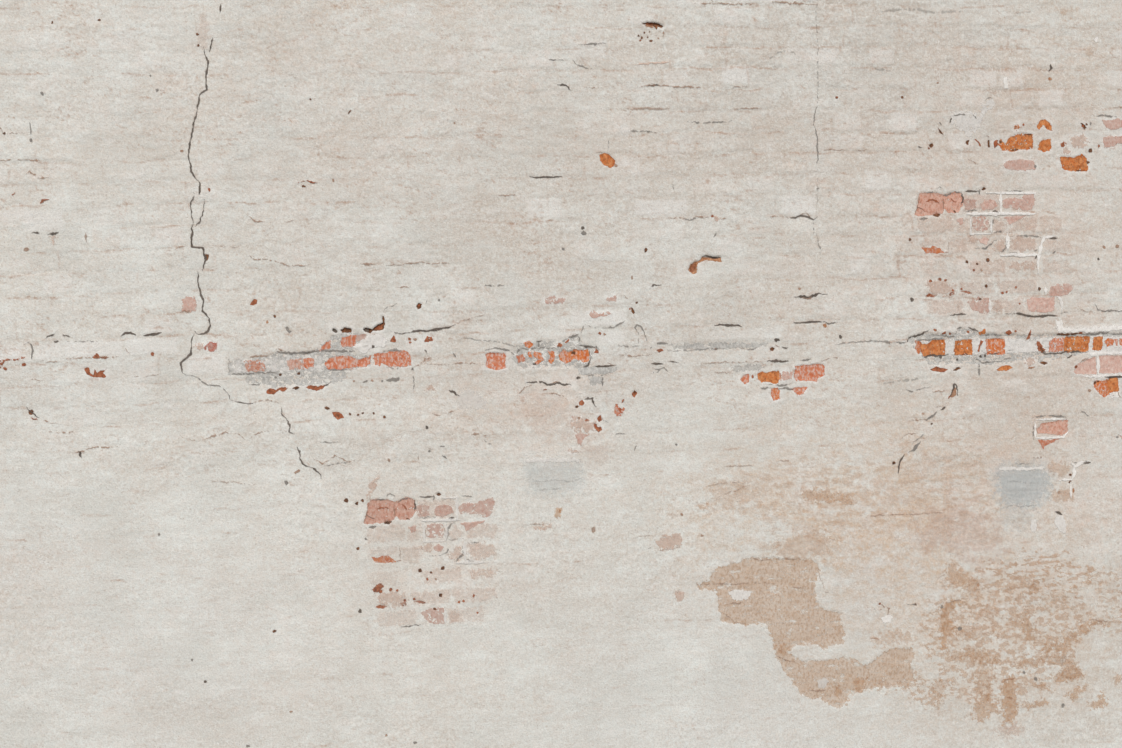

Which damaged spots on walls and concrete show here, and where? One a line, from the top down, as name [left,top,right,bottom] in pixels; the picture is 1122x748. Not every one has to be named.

peeling [918,97,1122,171]
crack [179,33,355,485]
peeling [900,186,1122,398]
crack [24,332,162,380]
peeling [228,316,433,394]
peeling [485,334,613,370]
peeling [740,364,825,400]
crack [29,410,118,457]
peeling [1033,415,1070,458]
peeling [355,493,495,580]
peeling [373,583,447,627]